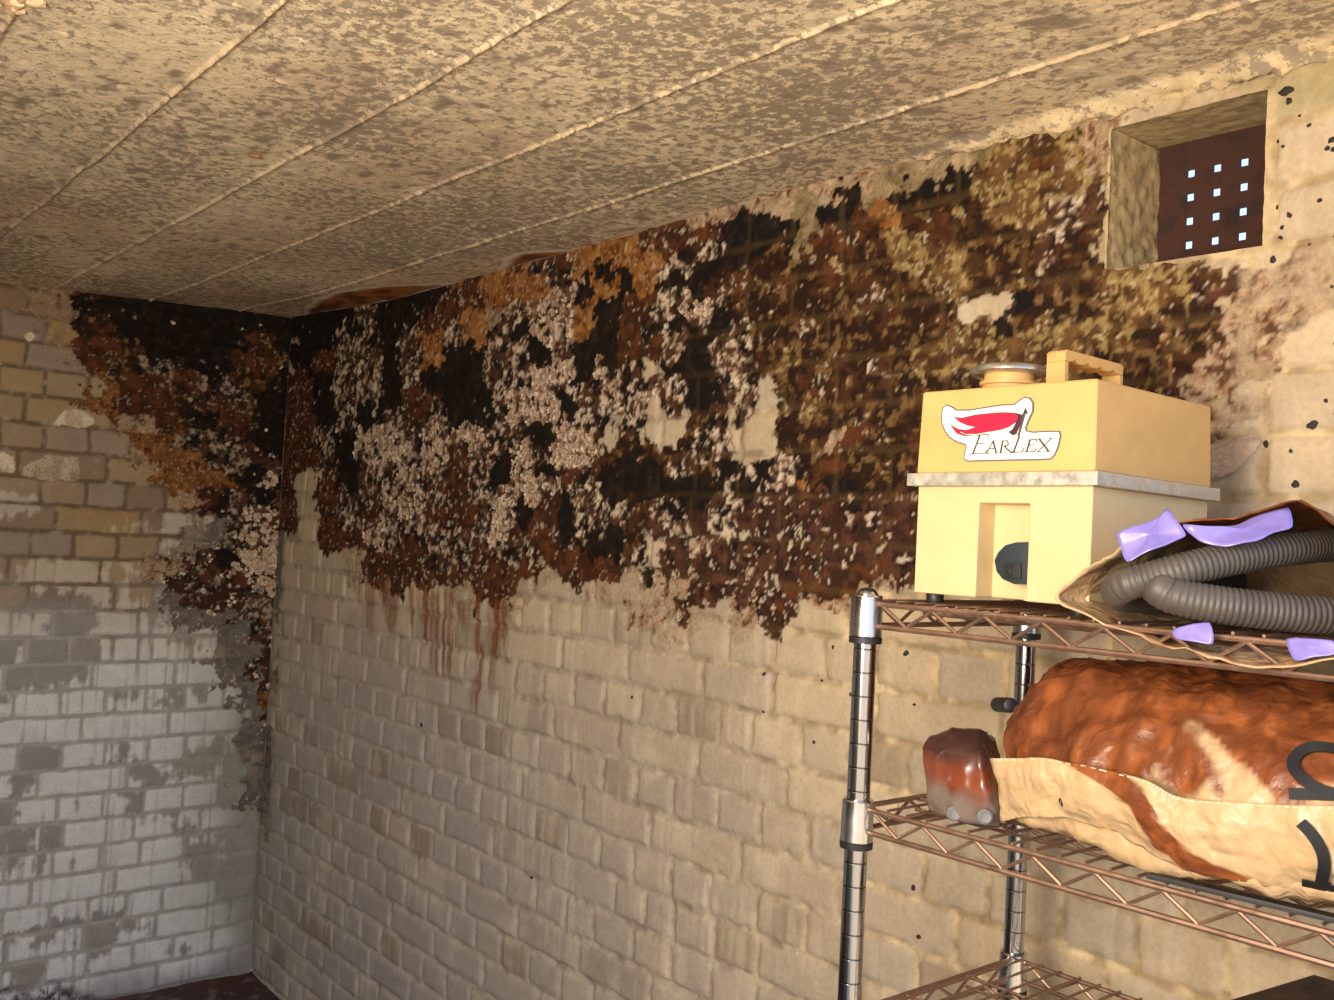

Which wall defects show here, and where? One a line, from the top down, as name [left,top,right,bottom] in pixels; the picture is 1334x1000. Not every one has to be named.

spalling [0,0,46,18]
peeling [52,409,95,429]
peeling [0,452,79,481]
leakage [15,116,1246,842]